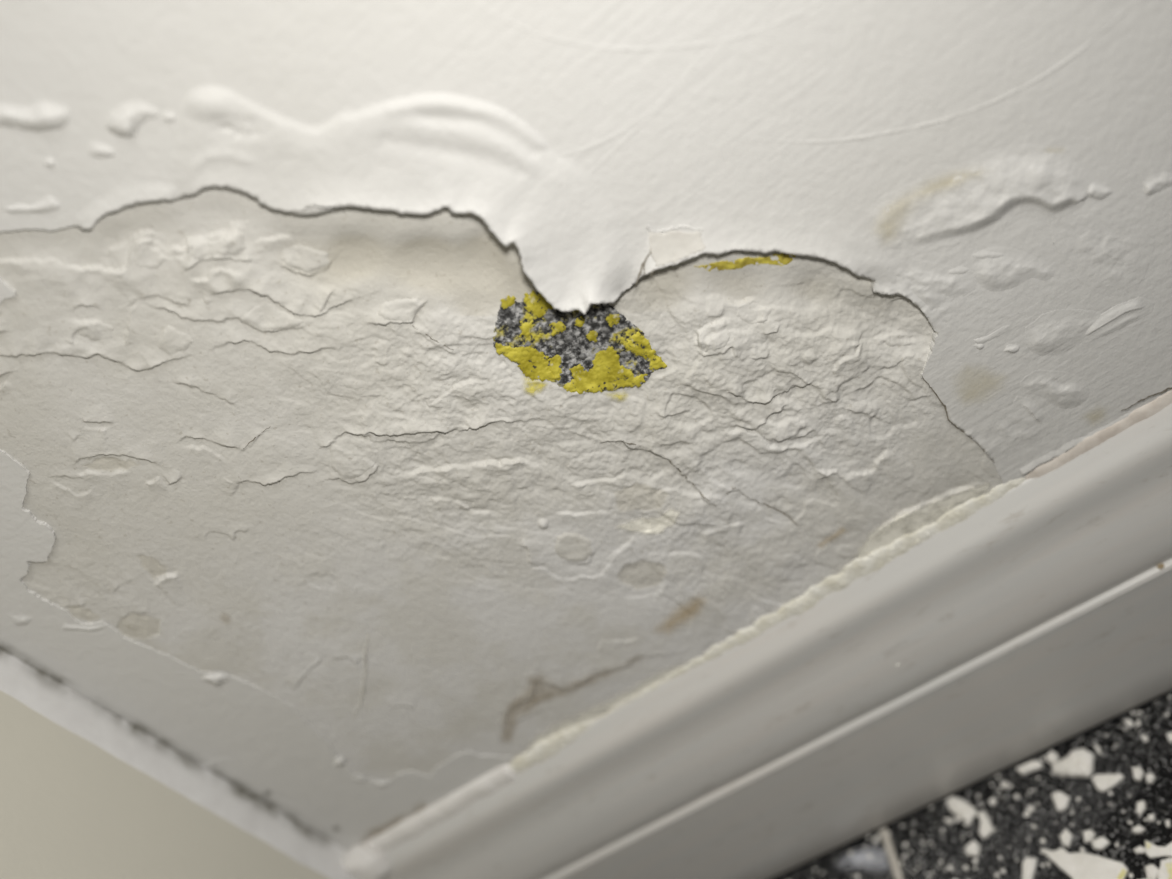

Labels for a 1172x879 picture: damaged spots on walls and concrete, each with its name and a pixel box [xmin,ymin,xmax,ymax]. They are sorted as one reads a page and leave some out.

spalling [1080,297,1154,345]
peeling [0,84,1053,780]
peeling [1020,390,1172,480]
spalling [1046,743,1156,792]
spalling [1052,791,1070,812]